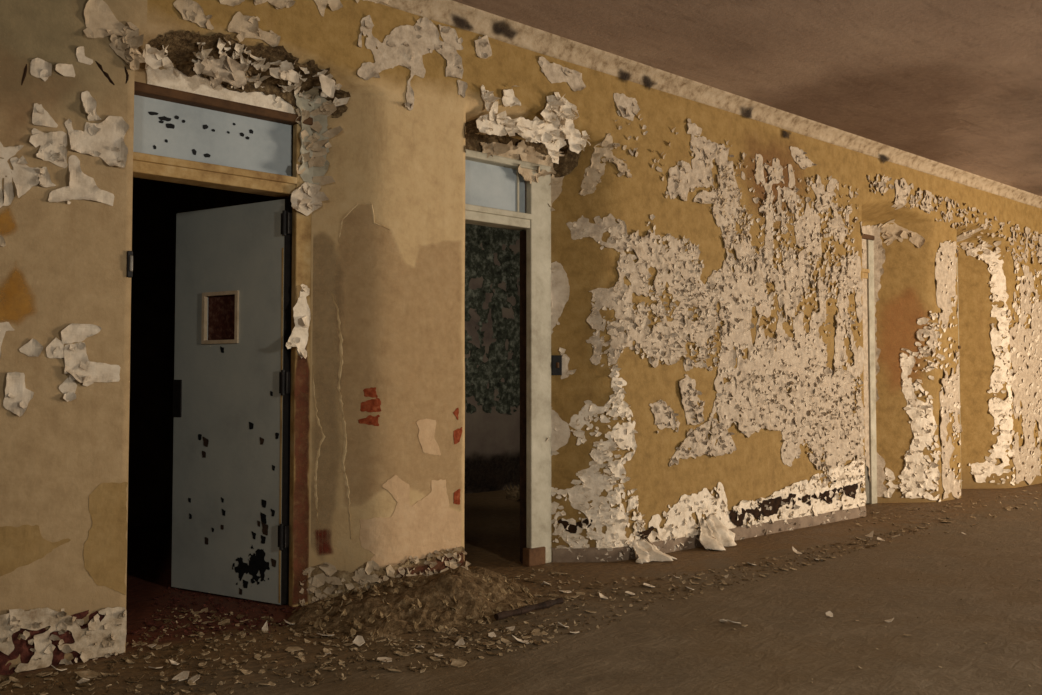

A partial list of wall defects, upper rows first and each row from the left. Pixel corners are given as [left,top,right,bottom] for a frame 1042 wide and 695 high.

peeling [0,91,129,208]
peeling [30,0,351,216]
spalling [357,10,648,211]
peeling [0,322,14,357]
peeling [3,372,34,417]
peeling [19,323,121,402]
spalling [358,387,381,426]
peeling [416,419,441,455]
peeling [453,223,523,444]
peeling [546,118,1042,561]
spalling [0,482,128,675]
peeling [299,475,471,606]